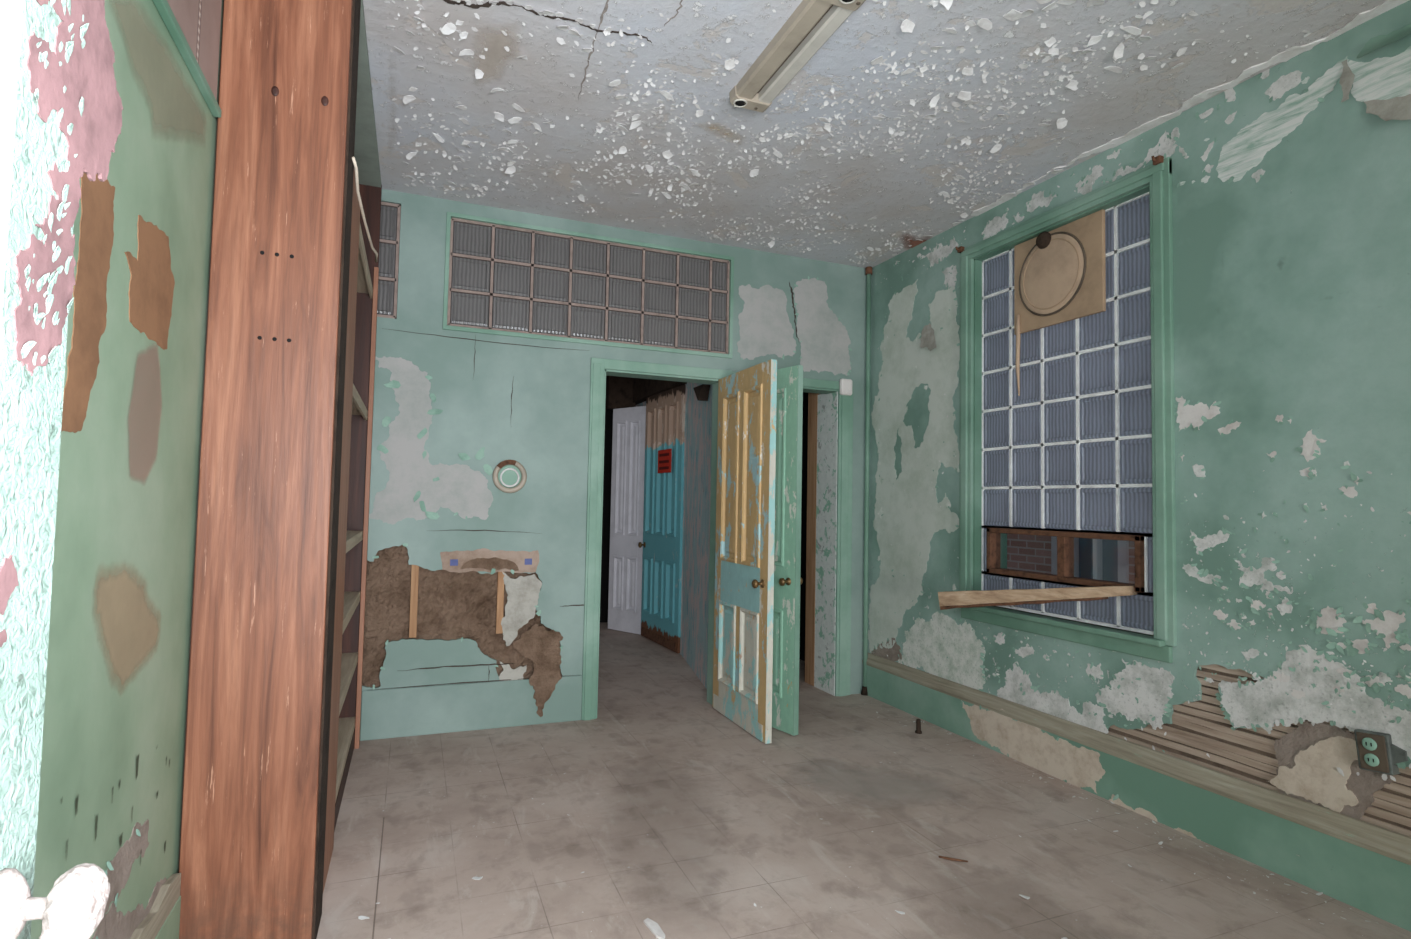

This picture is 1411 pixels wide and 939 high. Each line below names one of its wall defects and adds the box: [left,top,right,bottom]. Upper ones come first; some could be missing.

peeling [13,0,175,433]
crack [443,0,683,99]